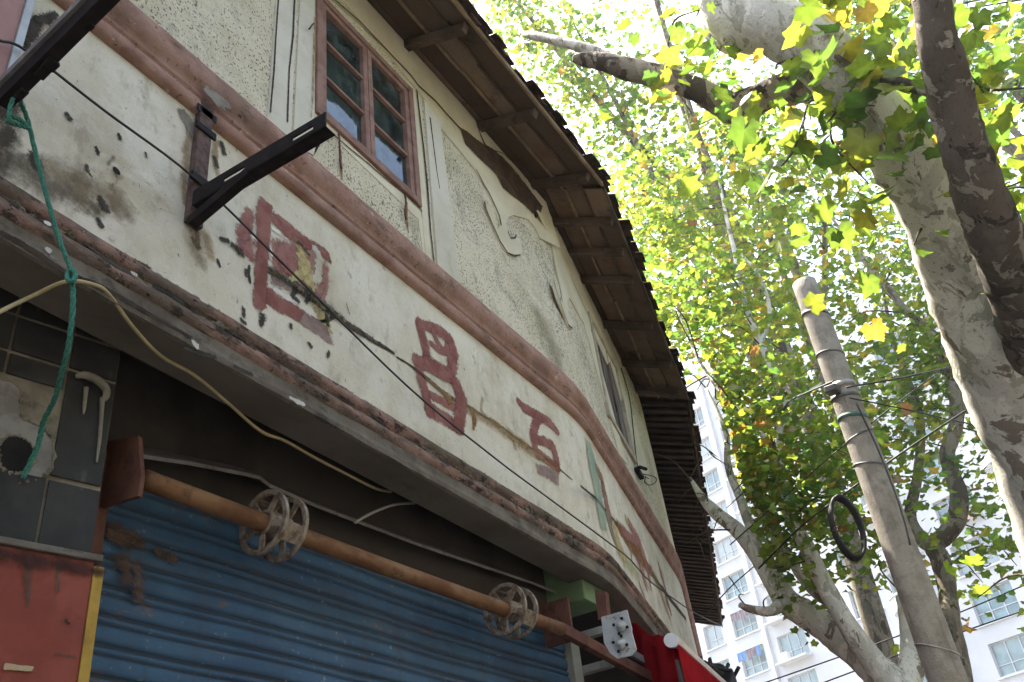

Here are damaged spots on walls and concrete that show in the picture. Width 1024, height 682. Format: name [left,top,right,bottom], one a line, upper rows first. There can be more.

leakage [0,104,130,230]
rust [106,521,178,603]